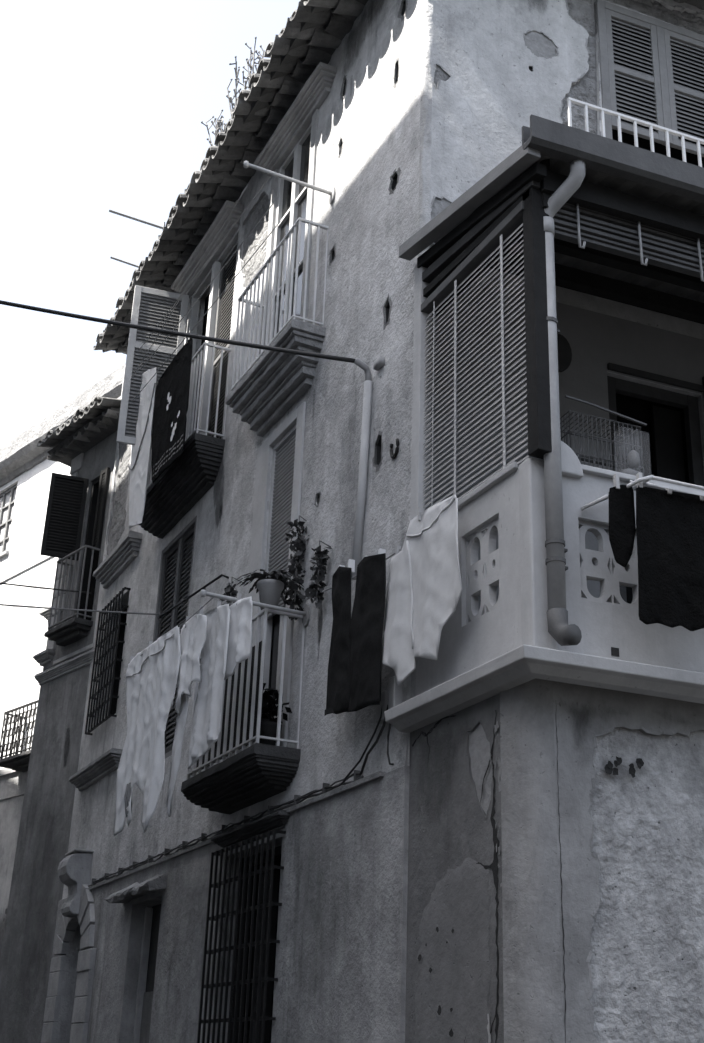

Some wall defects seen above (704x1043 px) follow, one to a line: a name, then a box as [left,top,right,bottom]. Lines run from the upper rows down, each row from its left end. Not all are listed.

spalling [432,63,452,90]
spalling [523,30,559,71]
spalling [559,0,704,136]
spalling [430,196,451,220]
peeling [466,720,493,820]
crack [476,710,502,1043]
spalling [586,726,704,1043]